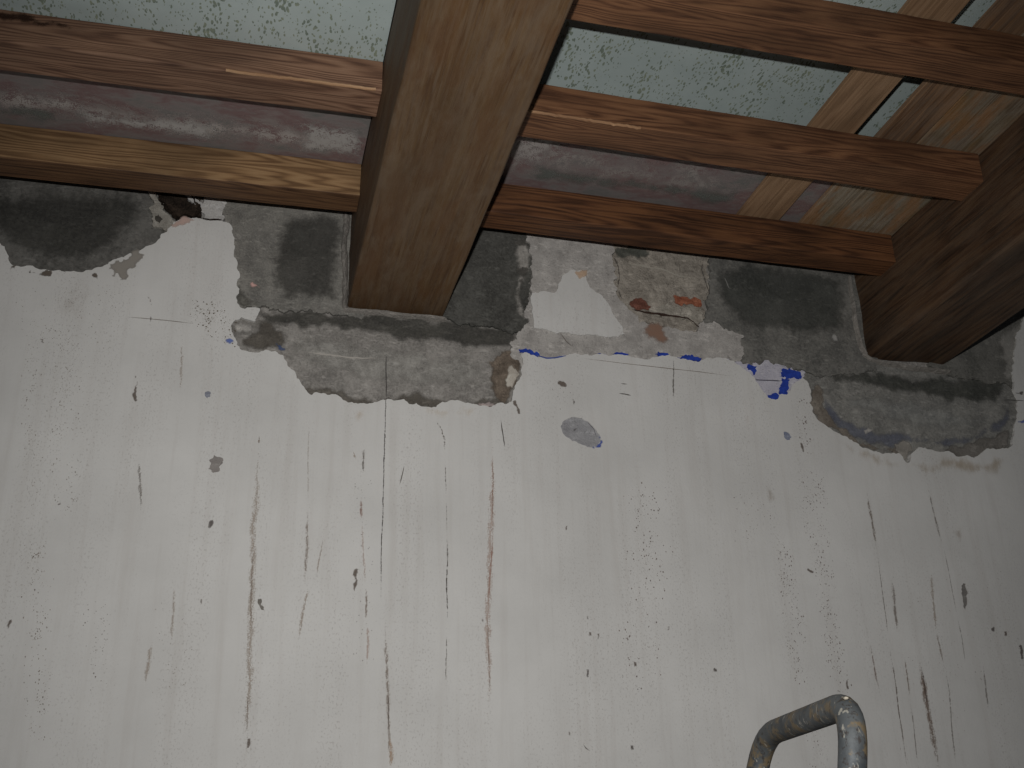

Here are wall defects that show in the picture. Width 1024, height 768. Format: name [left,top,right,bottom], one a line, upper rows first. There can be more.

spalling [0,176,227,280]
spalling [231,233,1017,463]
rust [646,324,667,342]